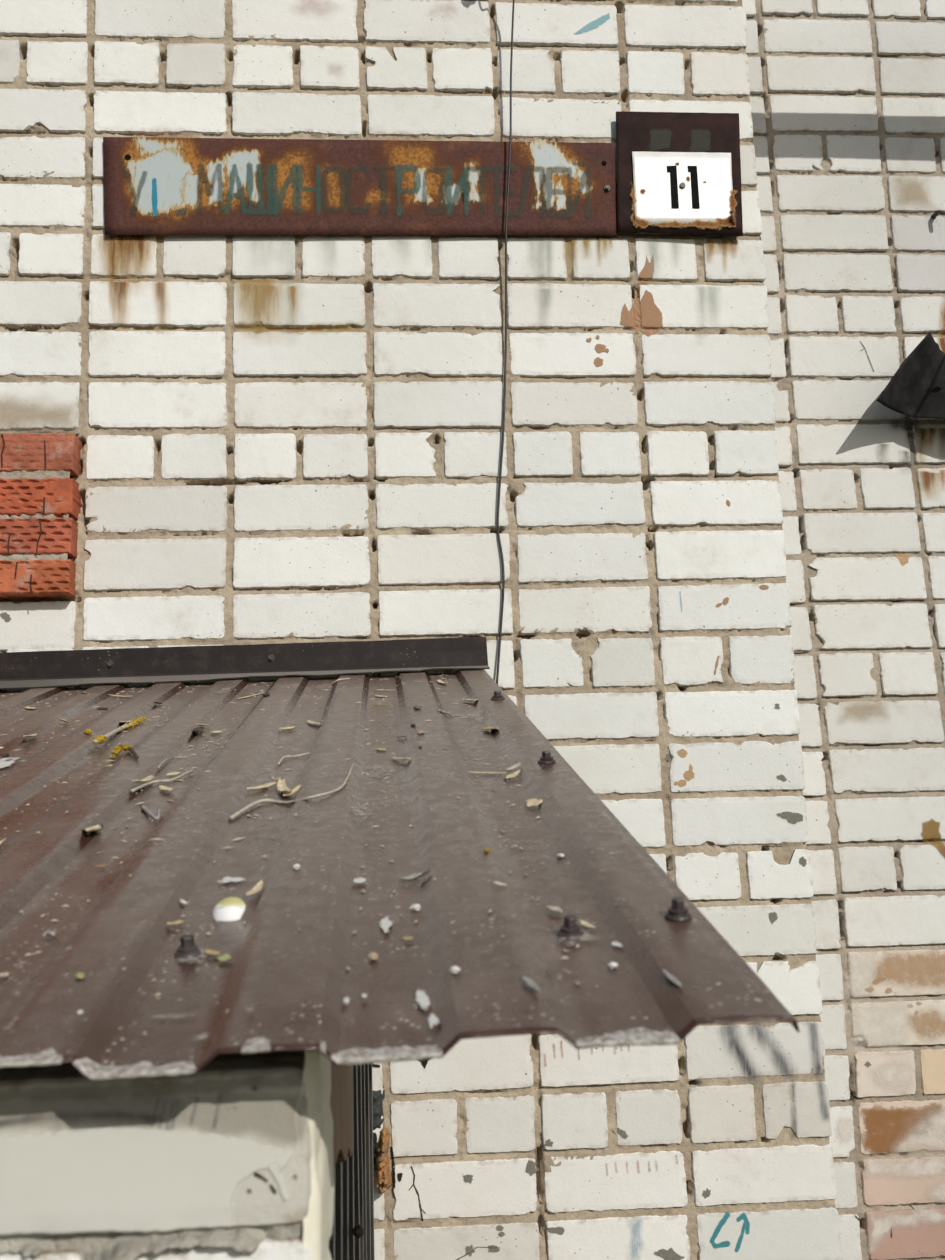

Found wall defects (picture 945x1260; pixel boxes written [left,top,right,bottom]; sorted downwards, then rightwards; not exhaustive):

corrosion [105,235,144,311]
corrosion [156,282,164,312]
corrosion [238,279,362,332]
crack [409,1166,426,1222]